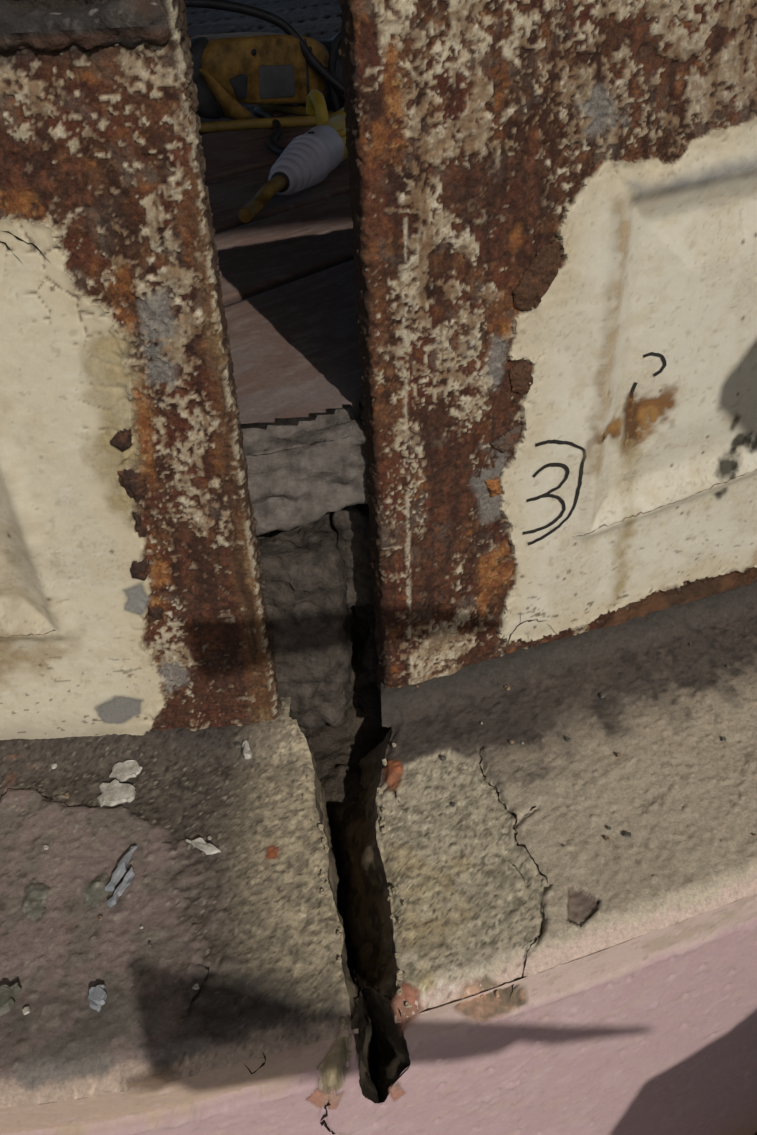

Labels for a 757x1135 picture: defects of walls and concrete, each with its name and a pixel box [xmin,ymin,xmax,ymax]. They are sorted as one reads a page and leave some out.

rust [0,0,282,735]
rust [338,0,757,696]
crack [294,717,410,1105]
crack [479,744,548,996]
spalling [394,983,421,1032]
spalling [456,978,527,1022]
crack [320,1100,335,1135]
spalling [307,1025,351,1109]
spalling [390,1084,405,1101]